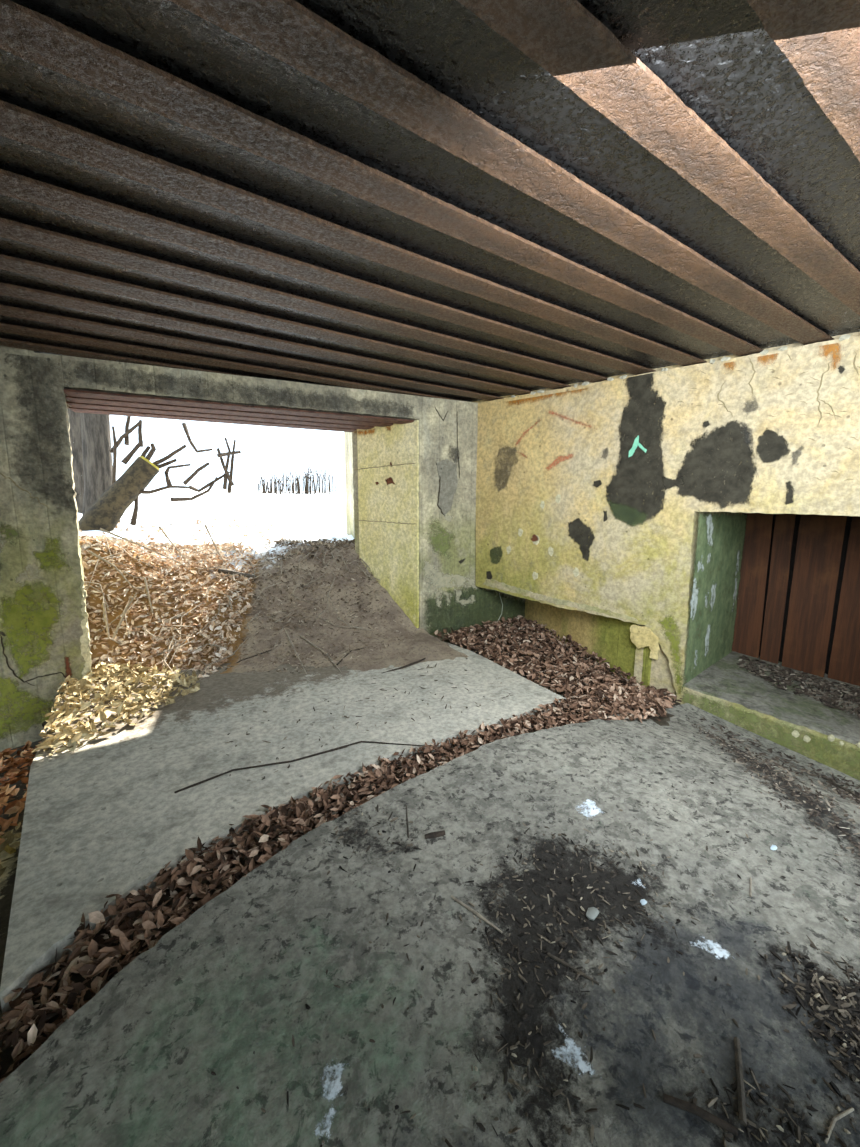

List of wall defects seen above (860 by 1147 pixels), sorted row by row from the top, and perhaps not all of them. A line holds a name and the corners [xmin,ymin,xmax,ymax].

corrosion [820,343,840,369]
crack [717,358,756,417]
crack [811,351,859,425]